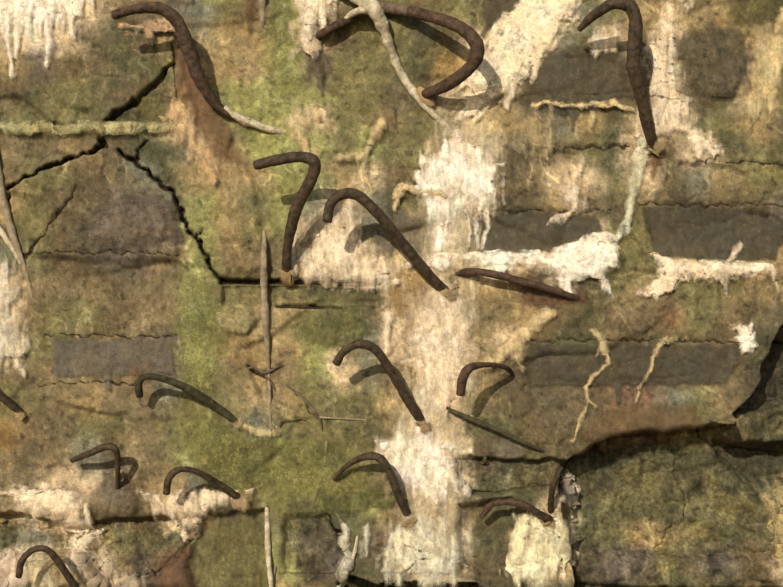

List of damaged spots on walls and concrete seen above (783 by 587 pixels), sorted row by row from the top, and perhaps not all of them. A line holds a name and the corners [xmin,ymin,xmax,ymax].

water stain [0,0,94,77]
water stain [118,18,175,46]
crack [164,37,177,77]
water stain [0,99,218,185]
crack [7,92,379,286]
corrosion [175,45,241,161]
water stain [337,118,386,193]
water stain [291,199,413,291]
water stain [0,262,29,377]
crack [275,302,342,310]
water stain [376,0,783,587]
water stain [337,523,360,587]